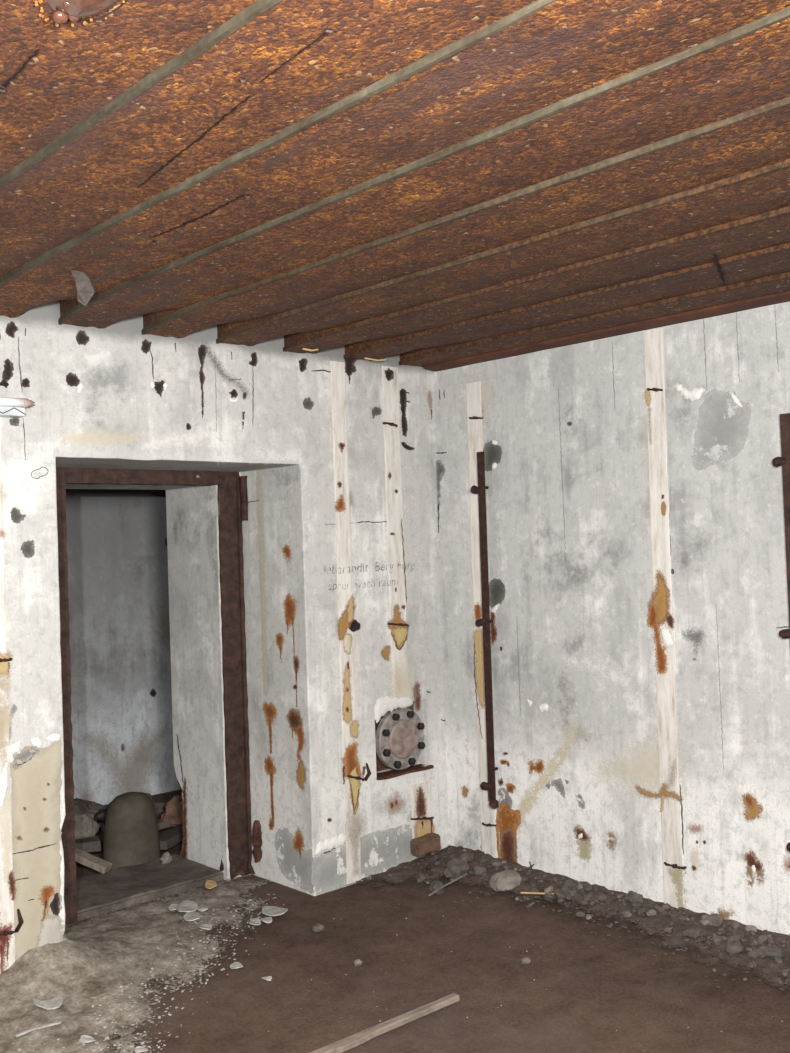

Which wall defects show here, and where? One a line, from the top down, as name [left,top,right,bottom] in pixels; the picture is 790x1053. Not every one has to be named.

crack [0,49,40,92]
rust [34,0,128,27]
crack [137,27,334,188]
rust [262,594,306,830]
rust [337,596,366,815]
rust [461,451,521,862]
rust [646,571,674,674]
peeling [0,705,66,961]
rust [743,792,763,822]